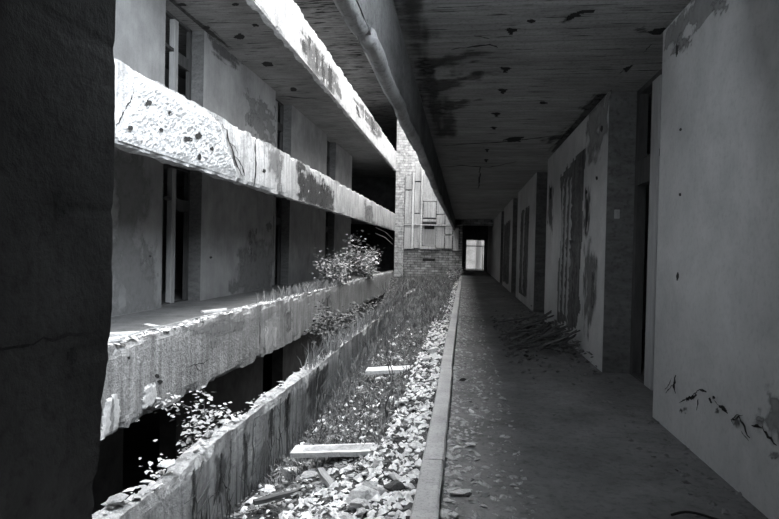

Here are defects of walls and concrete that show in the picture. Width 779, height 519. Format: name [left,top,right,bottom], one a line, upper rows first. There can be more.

water stain [300,31,342,99]
water stain [393,0,487,136]
spalling [116,71,237,177]
water stain [353,98,382,138]
water stain [296,161,335,211]
water stain [583,253,597,328]
peeling [100,393,121,440]
peeling [142,374,163,413]
spalling [680,389,728,414]